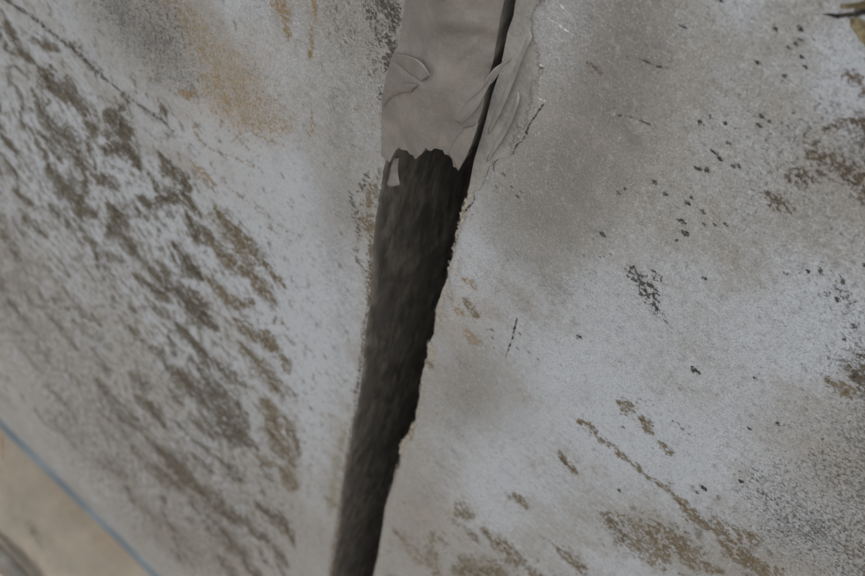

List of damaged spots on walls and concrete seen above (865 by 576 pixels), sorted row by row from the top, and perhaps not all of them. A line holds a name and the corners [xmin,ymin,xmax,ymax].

peeling [822,0,865,45]
crack [6,0,201,154]
leakage [841,69,865,98]
crack [493,104,544,172]
leakage [784,111,865,205]
leakage [764,190,796,214]
leakage [0,0,302,576]
leakage [805,262,855,307]
leakage [824,338,865,399]
leakage [616,397,674,456]
leakage [558,450,578,474]
leakage [577,419,865,576]